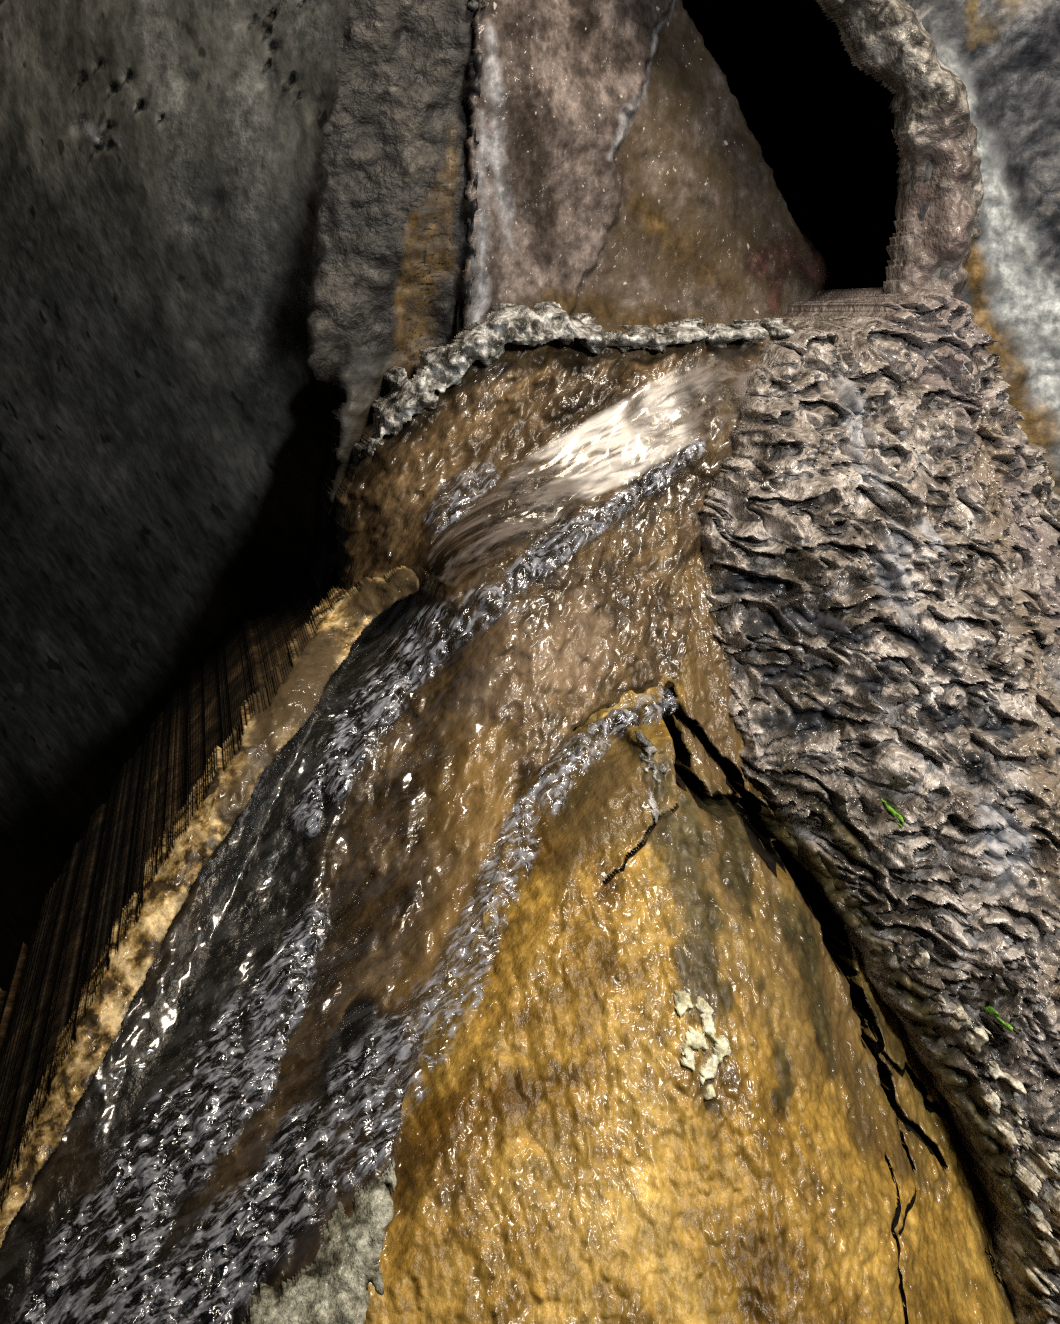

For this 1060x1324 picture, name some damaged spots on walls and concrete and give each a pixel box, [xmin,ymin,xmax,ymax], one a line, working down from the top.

efflorescence [967,98,1060,471]
efflorescence [622,709,667,824]
leakage [693,787,753,914]
efflorescence [673,990,731,1100]
crack [602,687,951,1324]
leakage [768,1016,794,1104]
efflorescence [242,1157,397,1324]